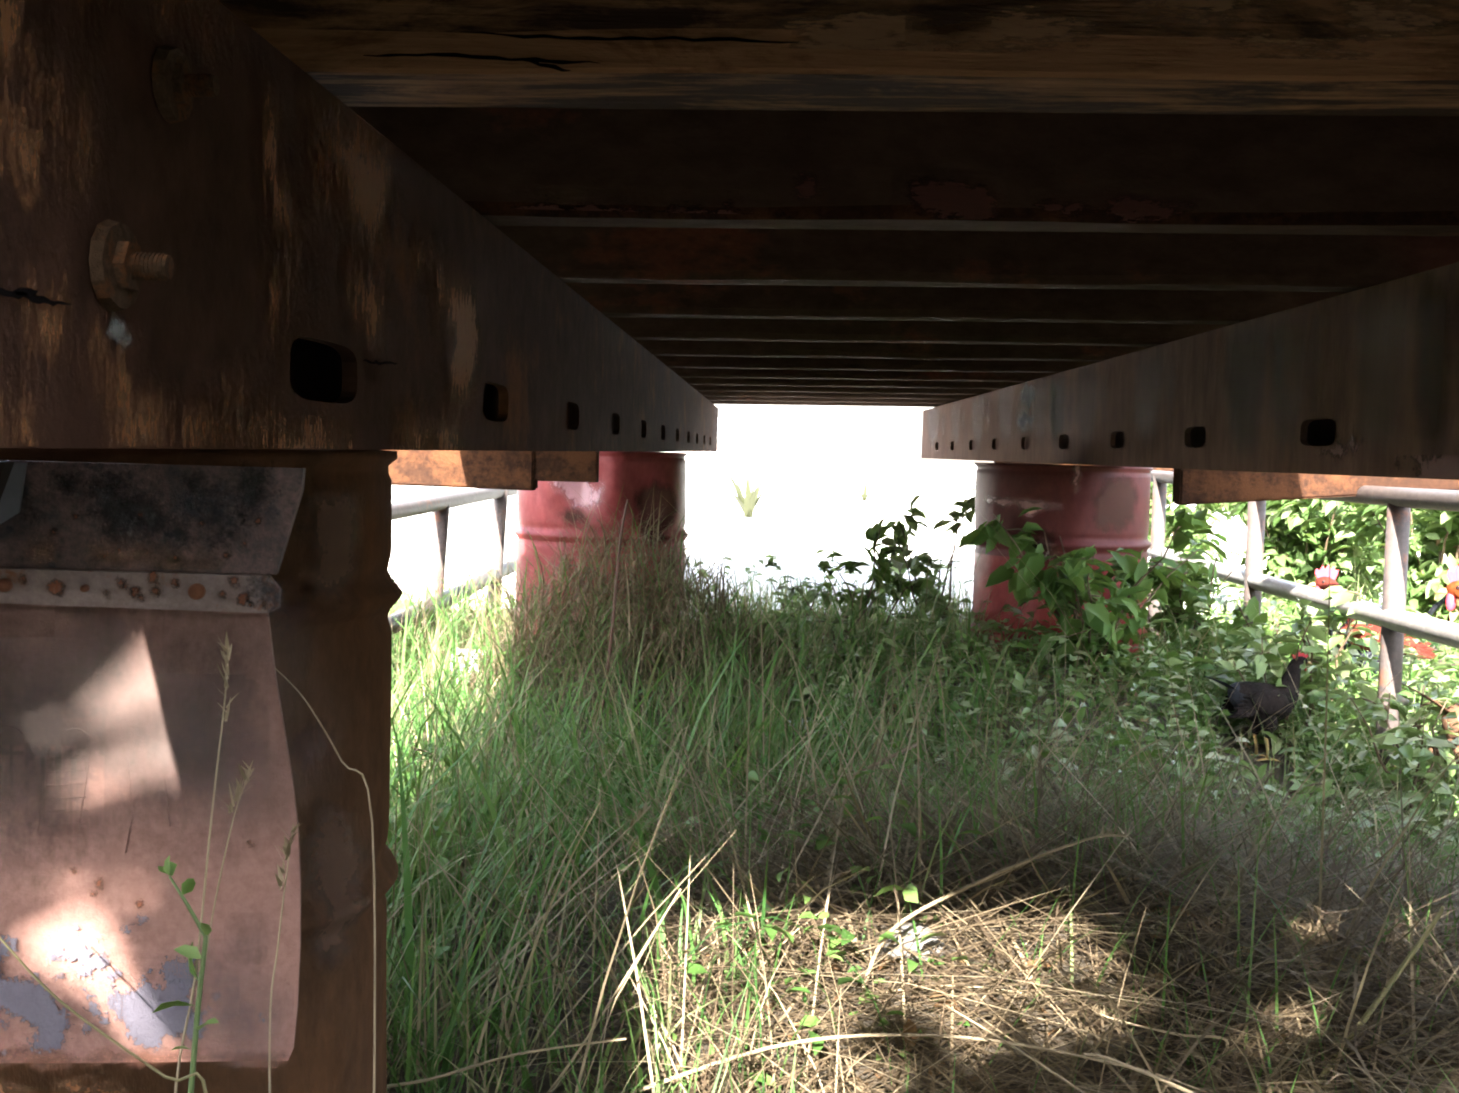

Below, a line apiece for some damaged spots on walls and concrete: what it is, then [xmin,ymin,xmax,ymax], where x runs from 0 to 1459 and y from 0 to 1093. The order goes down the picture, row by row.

corrosion [0,0,92,205]
corrosion [262,82,301,343]
crack [0,287,72,306]
corrosion [26,283,64,357]
corrosion [88,324,353,449]
corrosion [396,247,480,450]
peeling [0,925,221,1054]